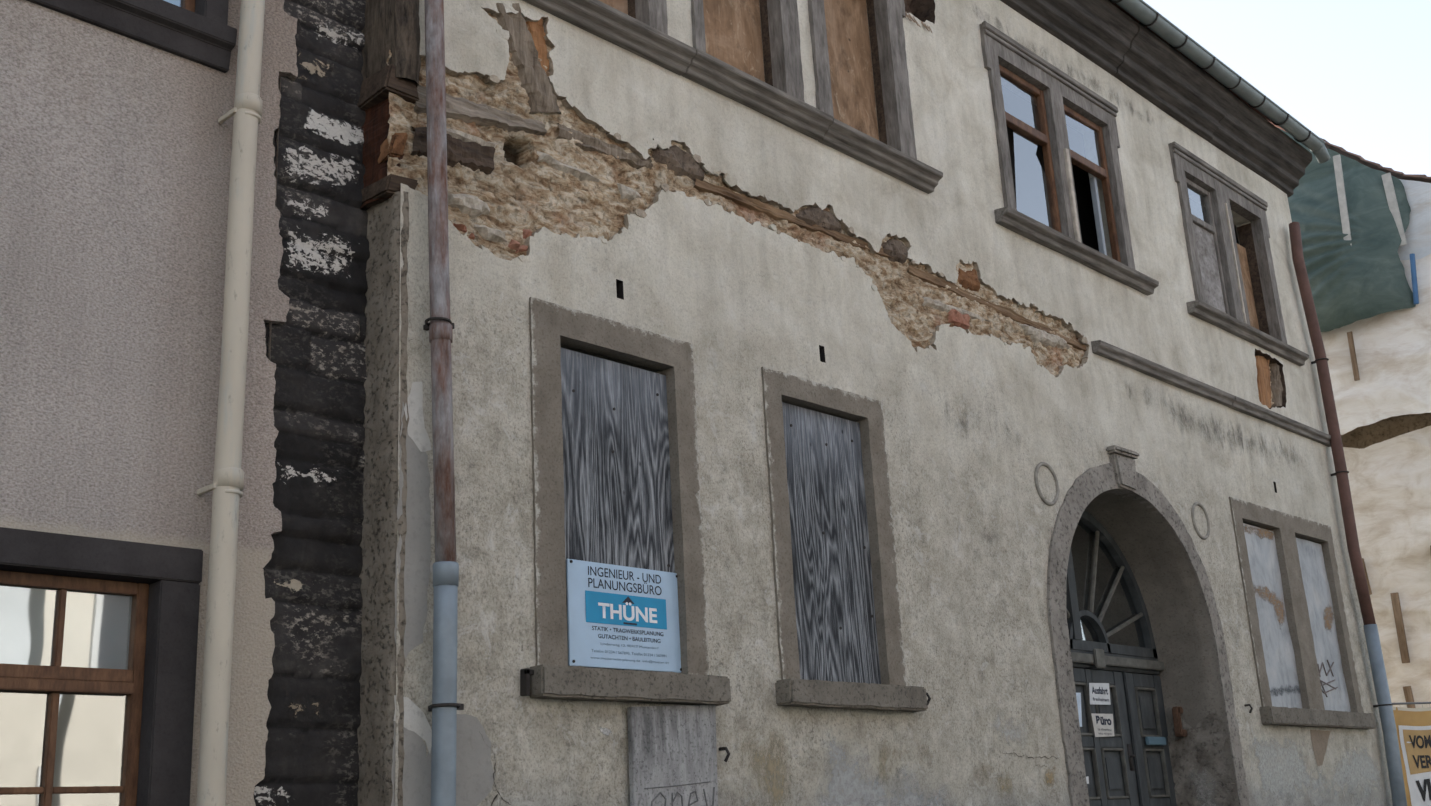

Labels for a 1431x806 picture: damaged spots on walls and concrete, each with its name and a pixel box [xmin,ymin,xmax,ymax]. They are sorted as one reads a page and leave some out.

spalling [387,55,428,196]
spalling [445,0,1089,378]
spalling [1255,349,1287,409]
peeling [394,382,431,659]
peeling [391,695,432,806]